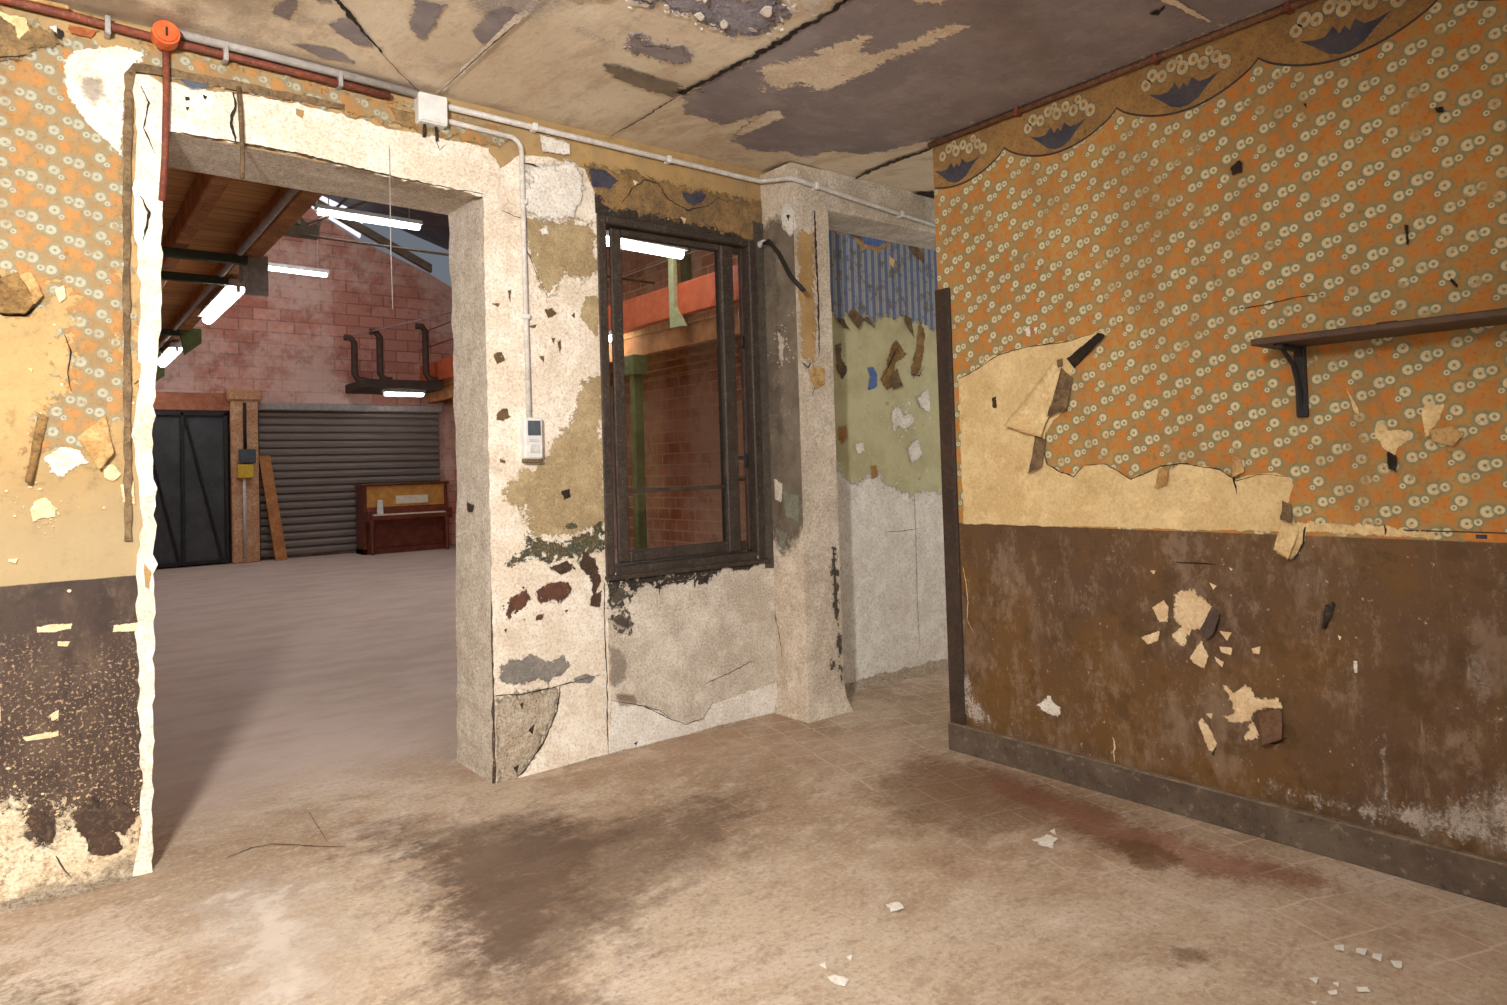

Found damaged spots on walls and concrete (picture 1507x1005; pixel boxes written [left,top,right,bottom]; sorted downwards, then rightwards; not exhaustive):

peeling [272,0,297,21]
peeling [291,0,373,64]
peeling [409,0,449,40]
peeling [472,7,519,43]
peeling [603,0,1288,159]
flaking render [0,45,777,903]
peeling [774,479,801,553]
peeling [1142,583,1232,668]
peeling [1198,684,1287,756]
leakage [1345,787,1507,850]